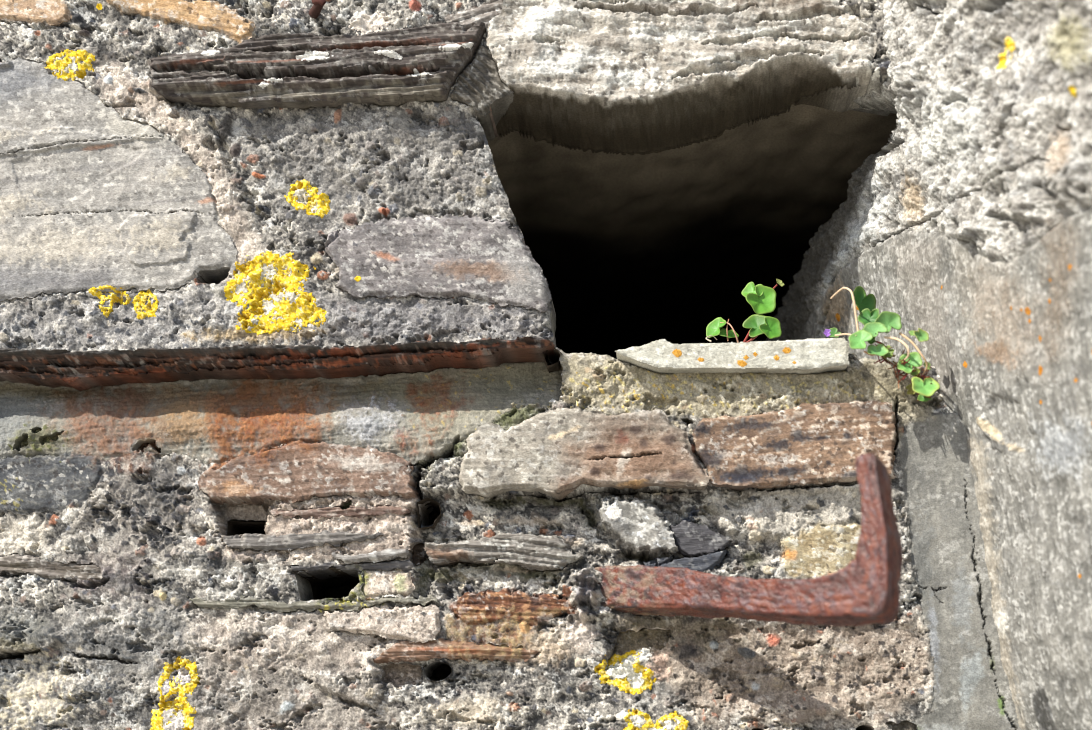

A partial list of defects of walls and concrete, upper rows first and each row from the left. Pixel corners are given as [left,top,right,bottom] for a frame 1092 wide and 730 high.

corrosion [206,387,318,455]